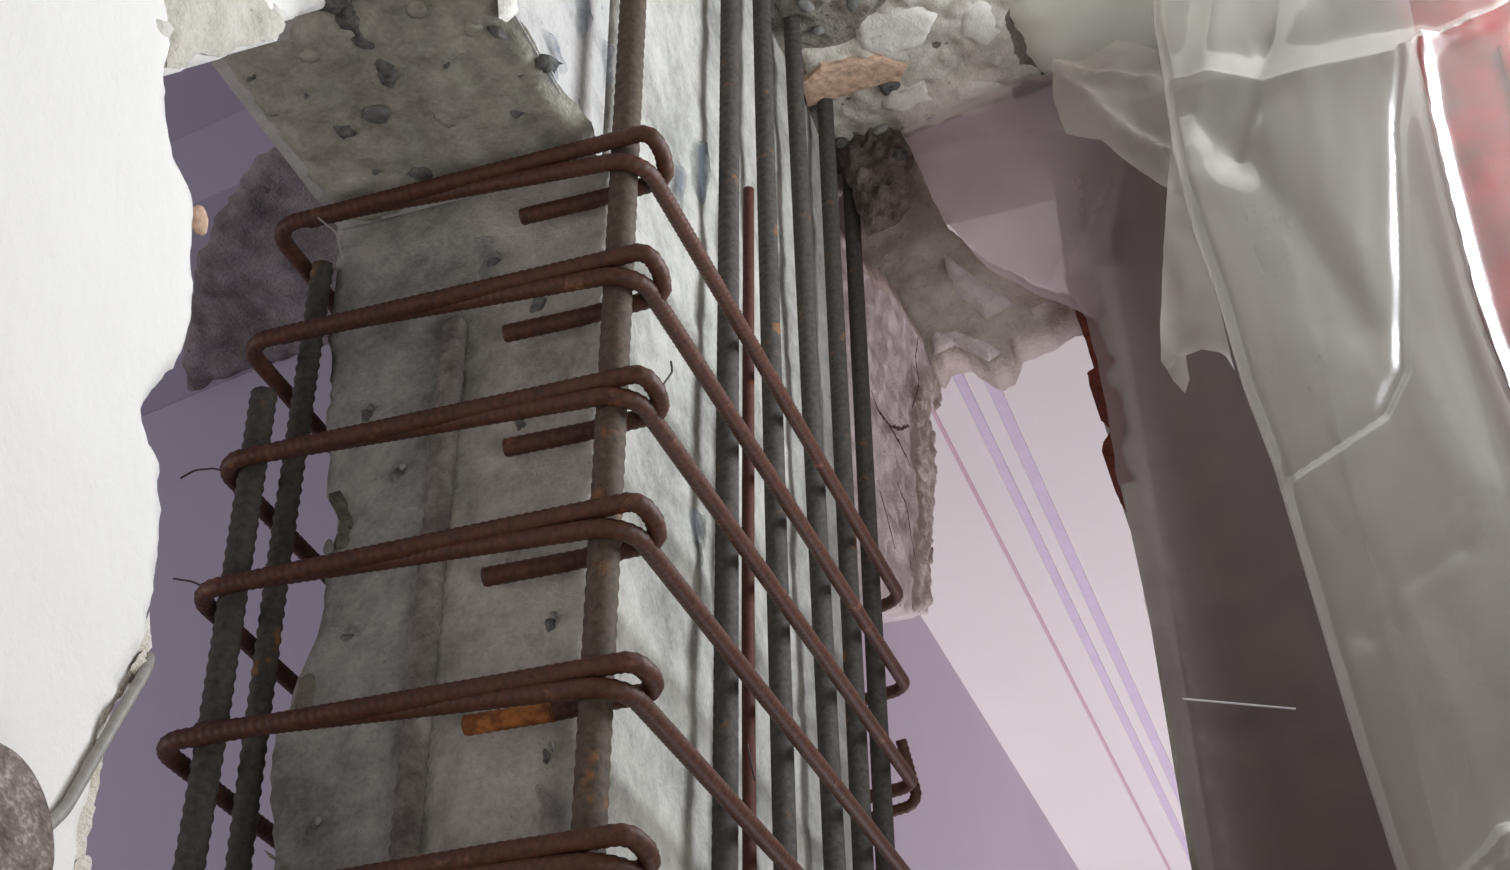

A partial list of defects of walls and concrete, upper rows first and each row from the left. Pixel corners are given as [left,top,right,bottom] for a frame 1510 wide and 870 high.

spalling [156,0,647,577]
peeling [711,0,1136,870]
spalling [197,584,316,723]
spalling [405,561,447,690]
spalling [544,611,558,632]
spalling [581,538,622,659]
spalling [172,735,290,870]
spalling [388,716,433,861]
spalling [571,698,614,830]